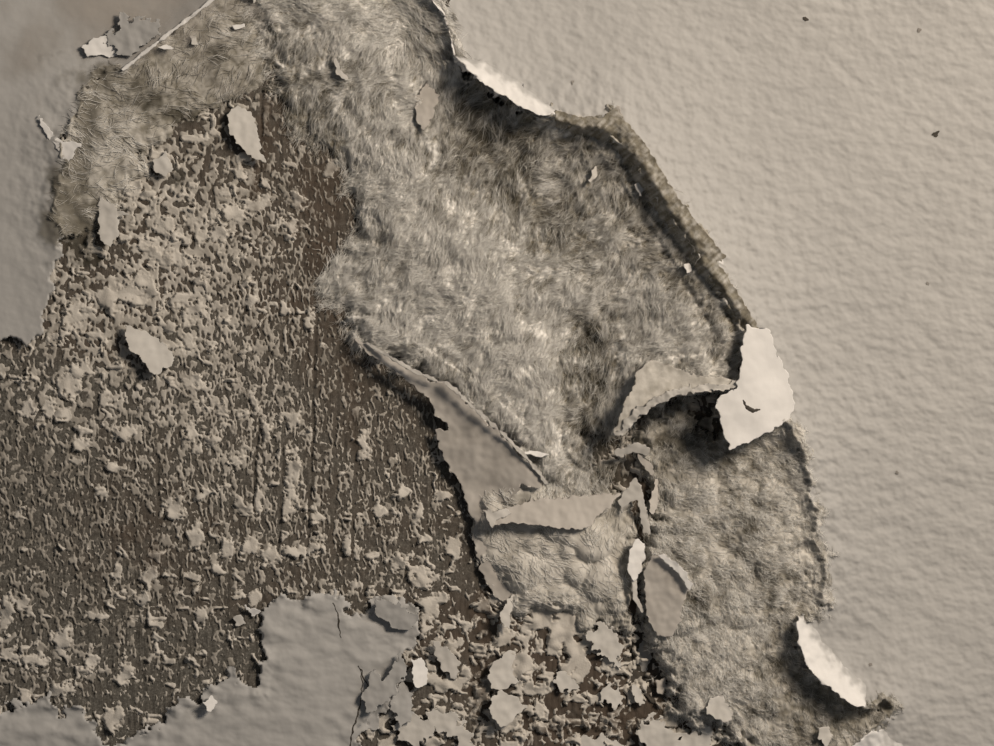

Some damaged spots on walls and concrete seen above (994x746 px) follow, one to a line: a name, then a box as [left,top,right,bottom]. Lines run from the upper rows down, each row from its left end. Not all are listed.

peeling [432,0,555,116]
peeling [0,42,739,746]
crack [349,666,368,746]
peeling [793,613,867,709]
peeling [852,729,903,746]